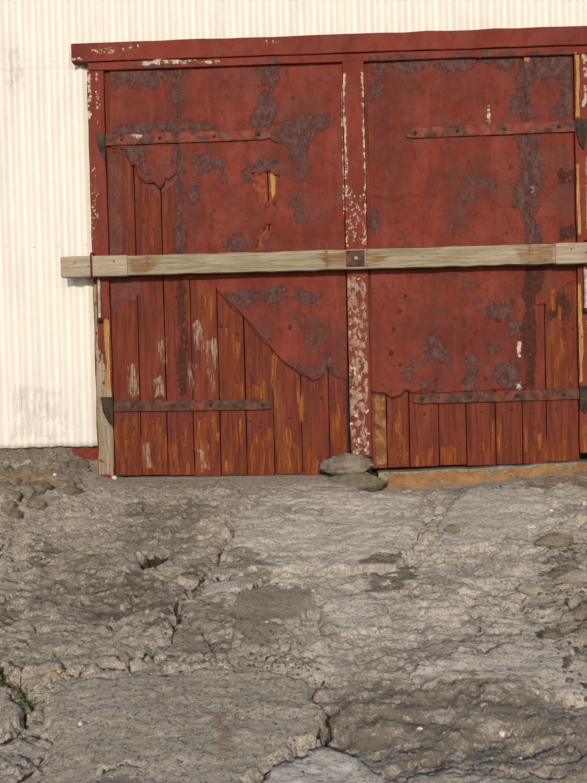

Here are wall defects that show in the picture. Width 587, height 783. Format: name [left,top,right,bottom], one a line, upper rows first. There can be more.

peeling [243,58,330,227]
peeling [341,73,380,247]
peeling [360,50,587,121]
peeling [511,134,544,244]
peeling [554,159,587,241]
peeling [158,281,218,395]
corrosion [199,292,314,410]
peeling [287,276,370,454]
peeling [486,266,547,390]
peeling [547,284,584,383]
crack [0,662,53,783]
crack [311,690,332,747]